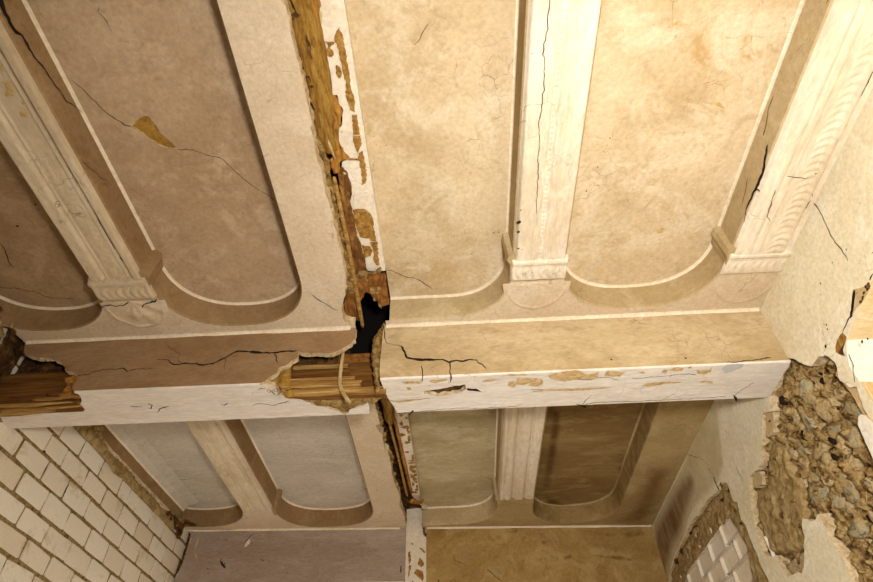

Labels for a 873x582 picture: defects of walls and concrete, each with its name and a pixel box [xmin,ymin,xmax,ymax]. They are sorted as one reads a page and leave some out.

crack [0,0,131,127]
flaking render [131,116,178,149]
crack [536,0,550,214]
crack [742,97,848,261]
flaking render [258,0,625,524]
flaking render [850,282,871,318]
flaking render [0,306,82,403]
crack [79,343,296,376]
crack [383,325,543,415]
crack [562,373,754,408]
flaking render [638,364,743,387]
flaking render [670,332,873,582]